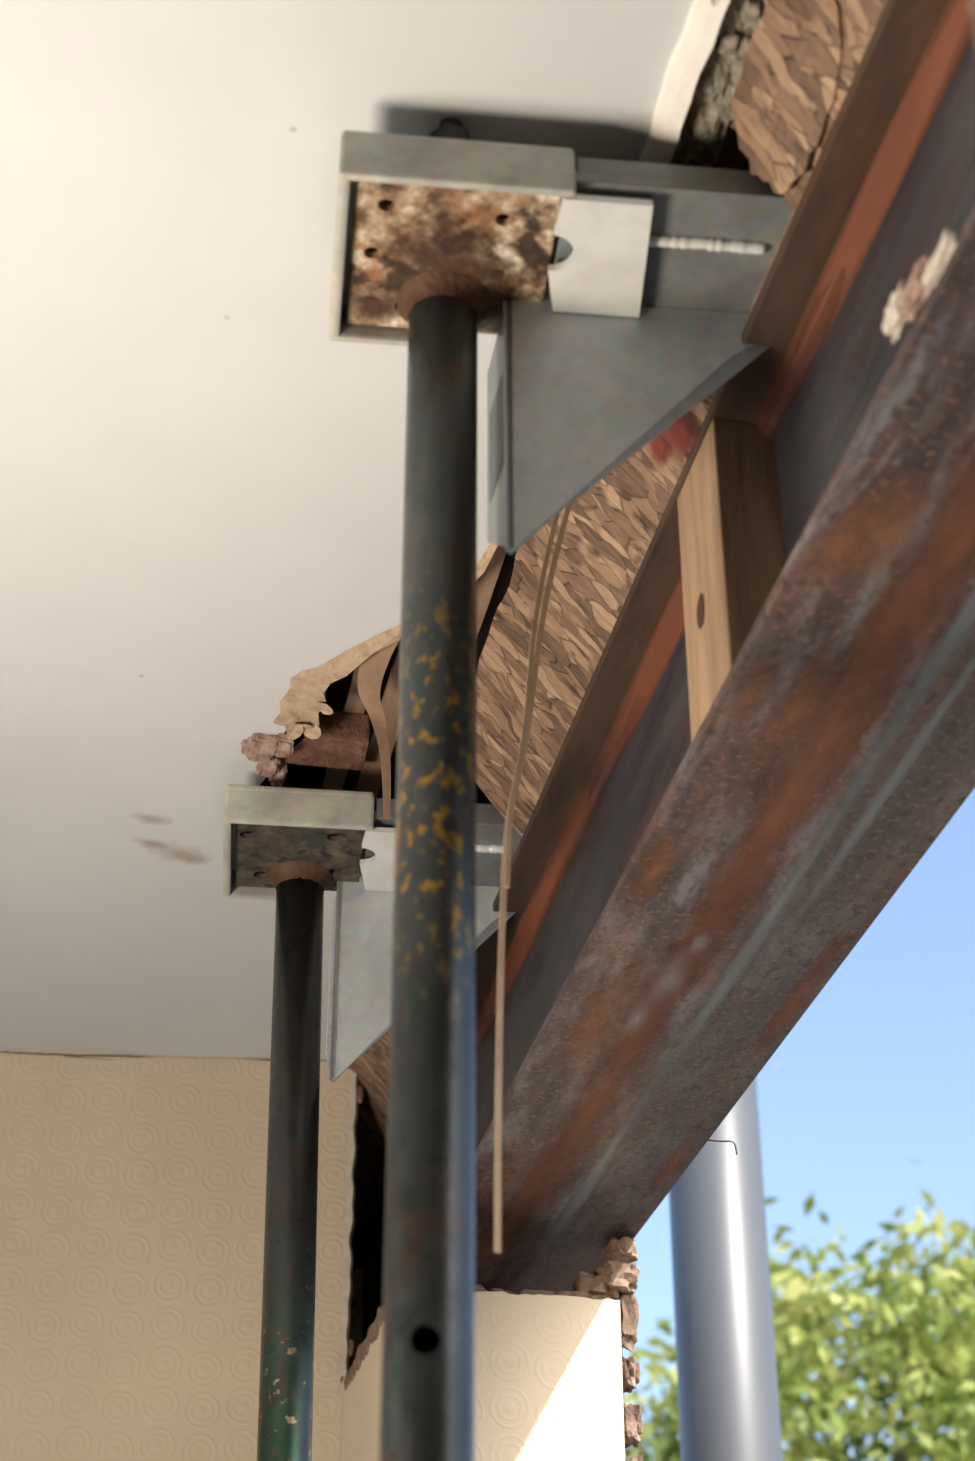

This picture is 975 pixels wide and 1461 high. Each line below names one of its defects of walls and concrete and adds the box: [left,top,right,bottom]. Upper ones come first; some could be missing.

rust [346,293,393,316]
rust [396,228,512,318]
rust [789,0,971,379]
spalling [241,711,370,787]
rust [611,574,685,753]
rust [479,792,594,1030]
spalling [475,1236,643,1461]